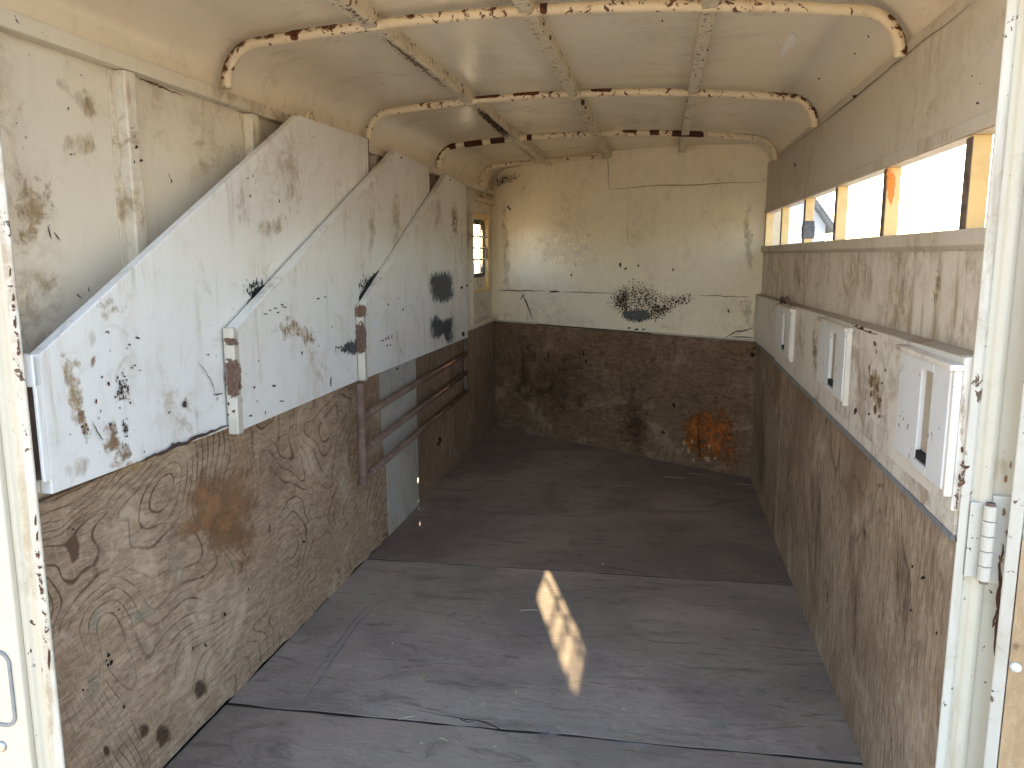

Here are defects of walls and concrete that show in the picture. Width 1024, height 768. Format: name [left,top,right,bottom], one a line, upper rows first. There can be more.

corrosion [221,24,342,79]
corrosion [384,38,447,87]
corrosion [888,14,907,54]
corrosion [355,305,367,354]
corrosion [224,358,242,416]
corrosion [682,401,739,473]